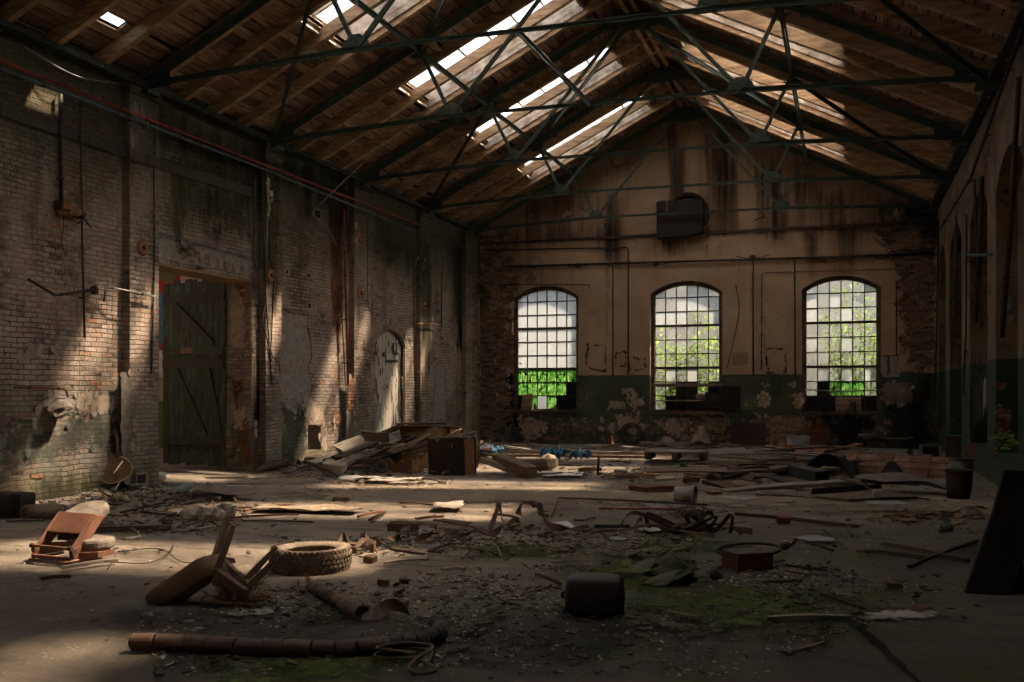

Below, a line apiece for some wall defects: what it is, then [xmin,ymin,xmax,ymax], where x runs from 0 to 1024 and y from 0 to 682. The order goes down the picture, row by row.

rust [330,221,343,353]
peeling [874,208,938,408]
peeling [0,393,119,466]
peeling [598,388,731,442]
peeling [748,381,815,441]